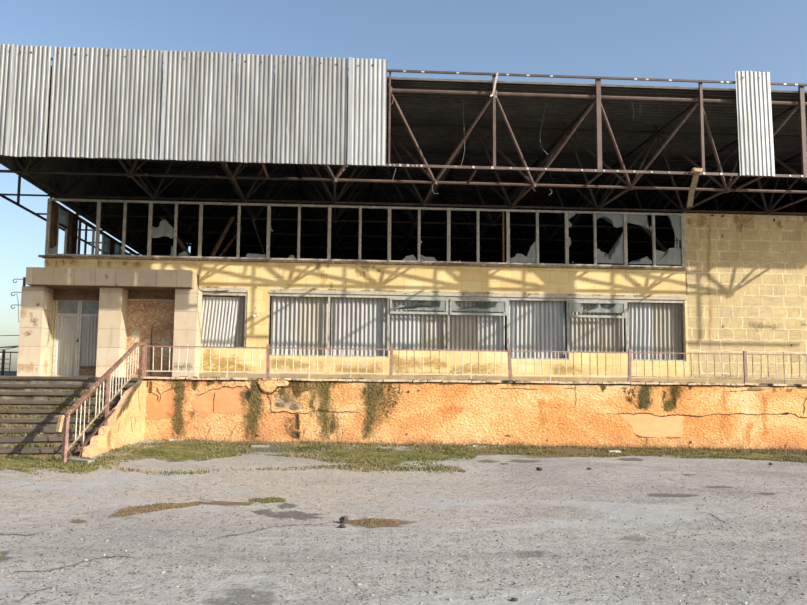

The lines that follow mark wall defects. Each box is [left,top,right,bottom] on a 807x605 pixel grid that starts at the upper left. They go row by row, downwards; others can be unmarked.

crack [118,380,350,431]
crack [596,389,807,418]